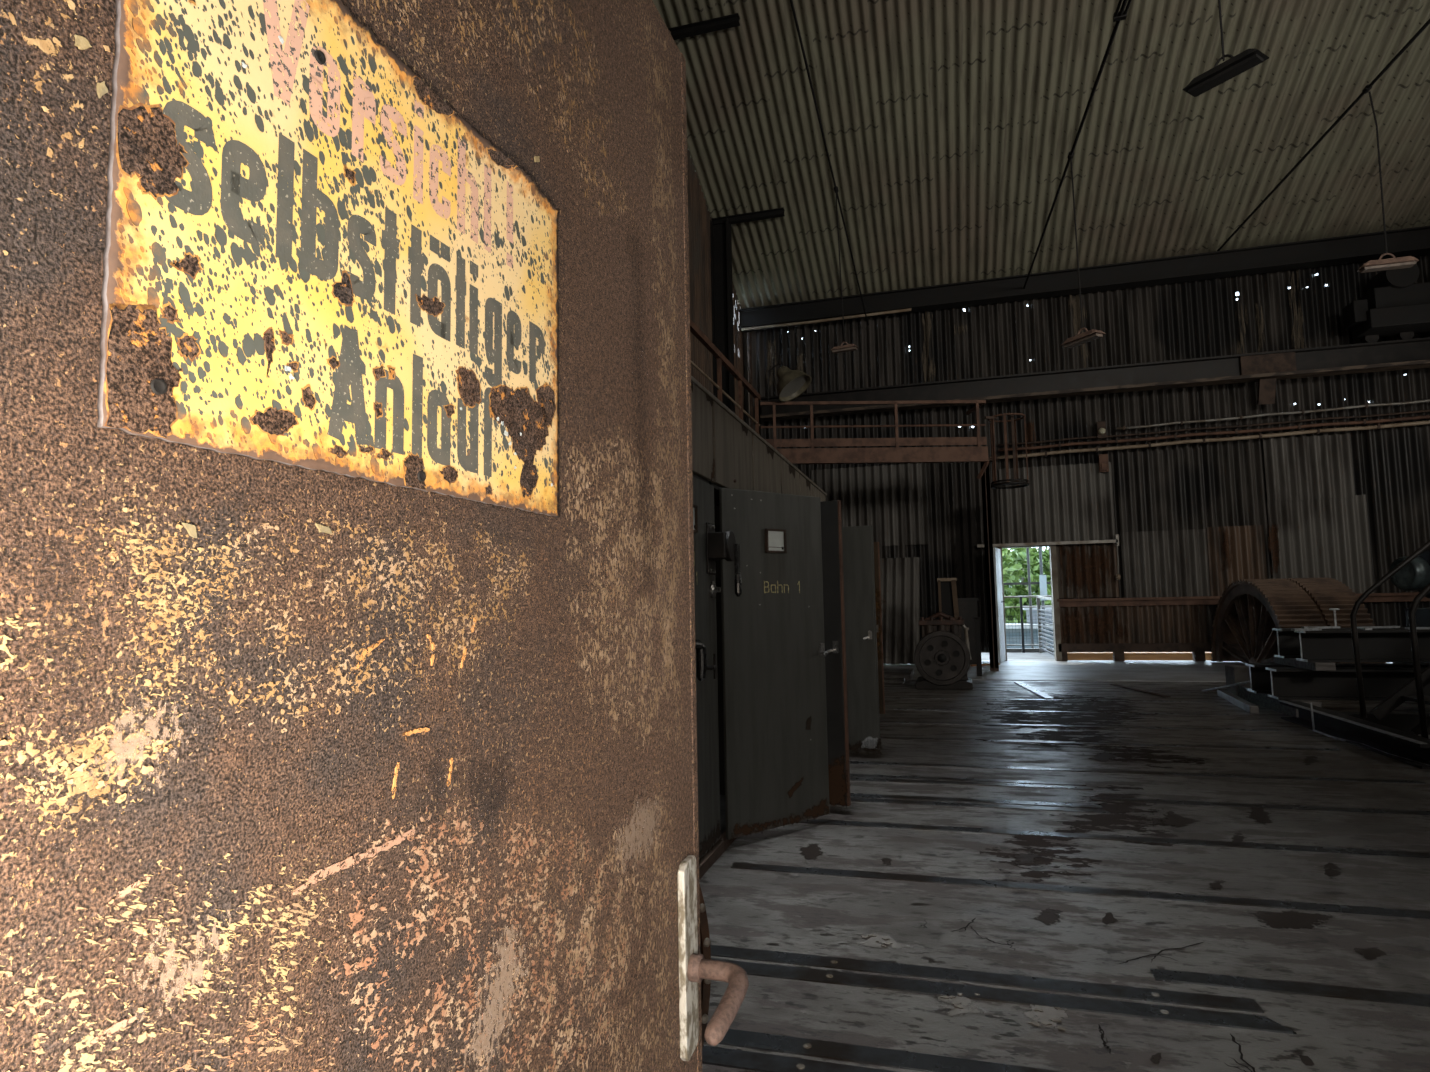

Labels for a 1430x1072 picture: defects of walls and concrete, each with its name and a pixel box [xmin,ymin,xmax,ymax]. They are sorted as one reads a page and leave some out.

peeling [0,0,713,1072]
water stain [981,693,1211,768]
water stain [979,784,1178,884]
crack [1119,942,1203,964]
crack [1225,1034,1255,1072]